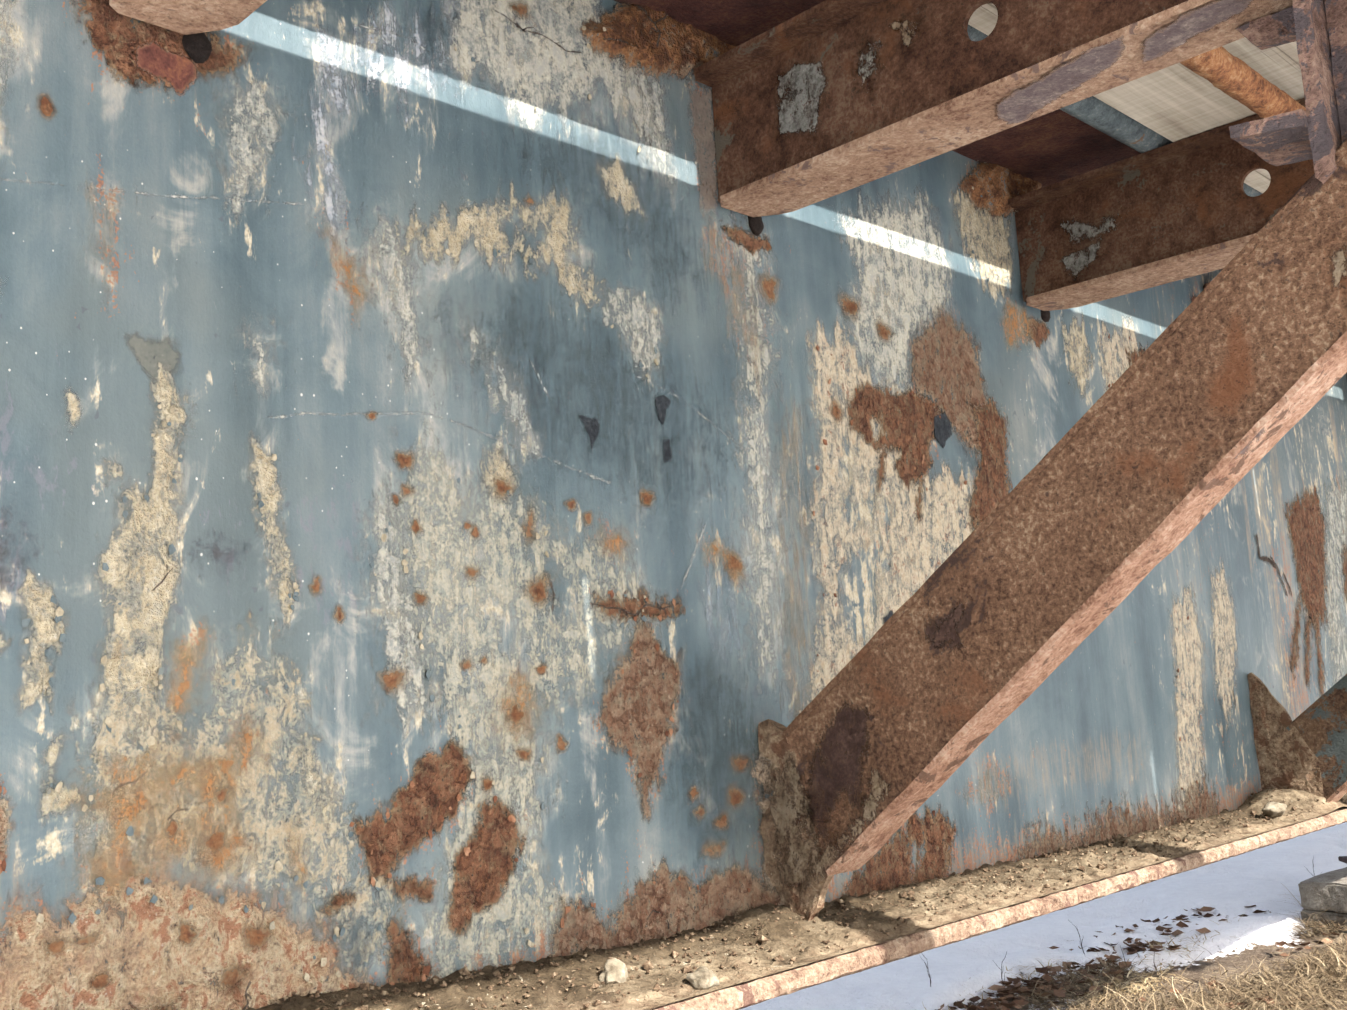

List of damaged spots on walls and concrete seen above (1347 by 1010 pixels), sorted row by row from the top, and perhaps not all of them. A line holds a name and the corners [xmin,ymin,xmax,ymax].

rust [72,0,252,95]
peeling [213,81,281,218]
peeling [307,0,678,252]
peeling [363,183,665,383]
rust [831,305,1013,529]
peeling [0,569,67,713]
peeling [40,362,404,983]
peeling [356,327,658,978]
rust [593,586,685,821]
rust [1283,486,1347,695]
rust [0,715,432,1010]
rust [349,741,526,936]